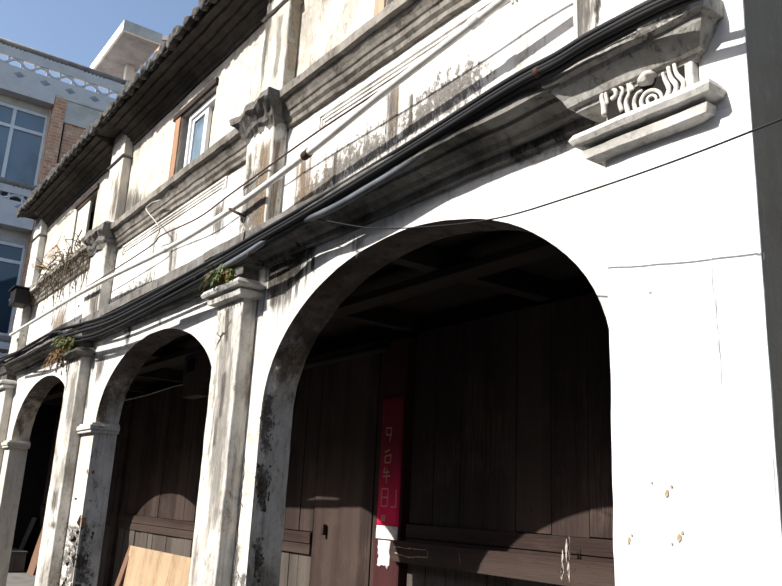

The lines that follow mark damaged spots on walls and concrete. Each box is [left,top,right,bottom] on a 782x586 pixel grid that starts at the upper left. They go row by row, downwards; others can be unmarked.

water stain [294,50,496,206]
water stain [510,128,567,163]
water stain [254,242,315,335]
peeling [260,387,277,453]
spalling [254,463,271,512]
spalling [61,515,94,586]
spalling [238,537,264,586]